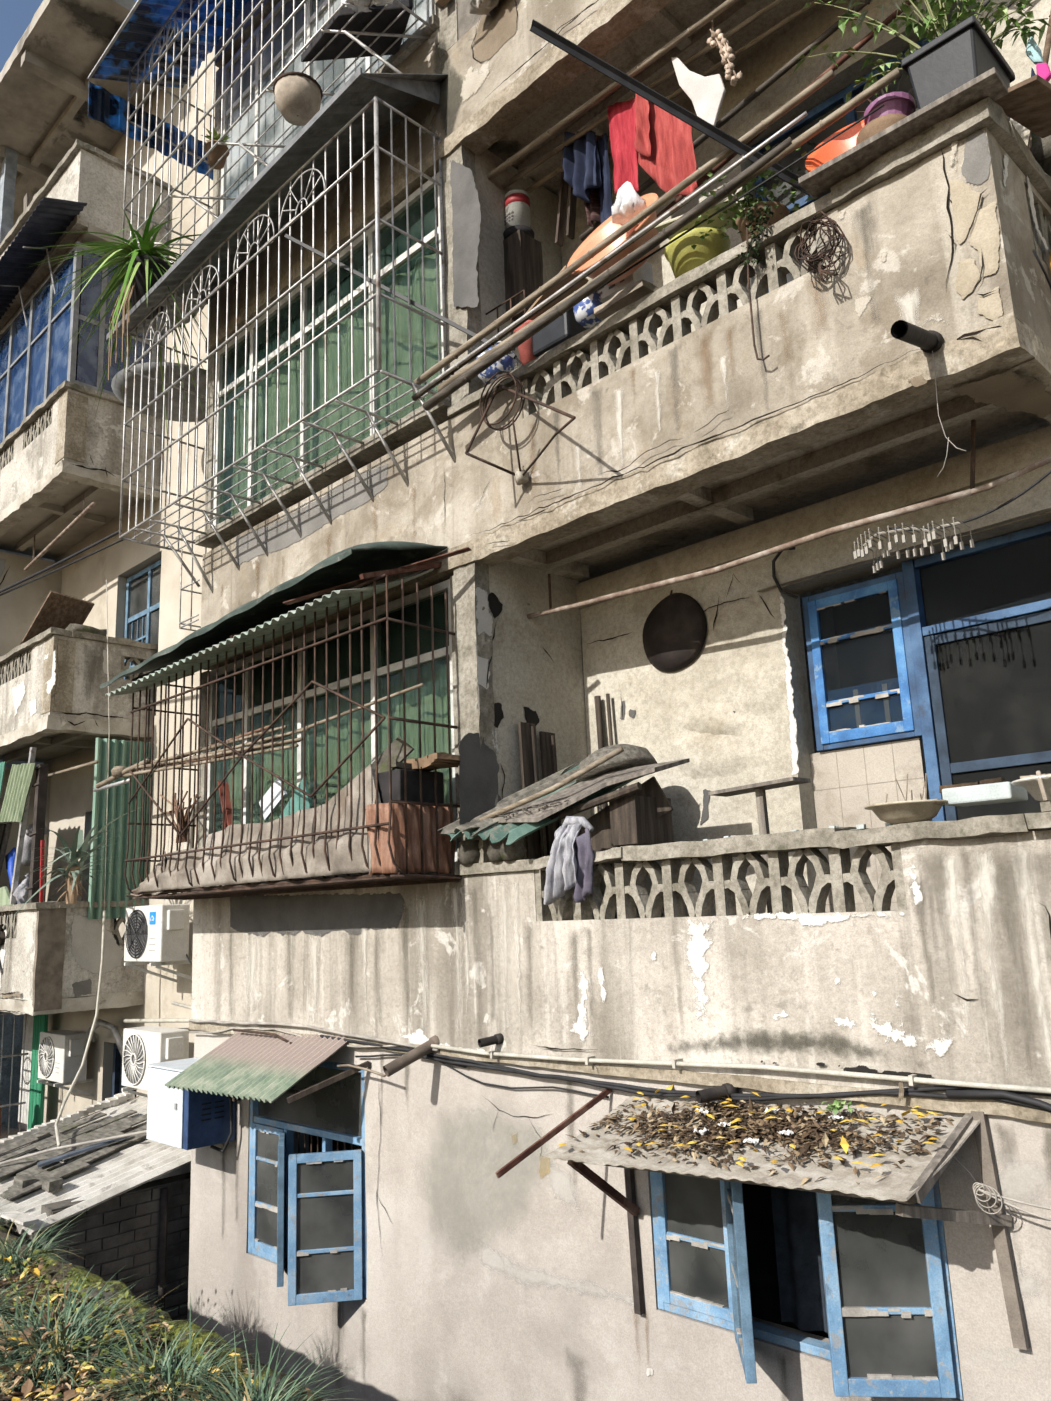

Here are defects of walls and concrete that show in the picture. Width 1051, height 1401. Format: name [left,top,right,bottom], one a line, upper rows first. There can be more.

flaking render [460,0,517,101]
crack [941,149,1017,341]
peeling [475,587,504,754]
spalling [523,707,540,725]
peeling [742,865,923,927]
peeling [570,967,607,1042]
peeling [686,919,714,1020]
peeling [834,991,953,1057]